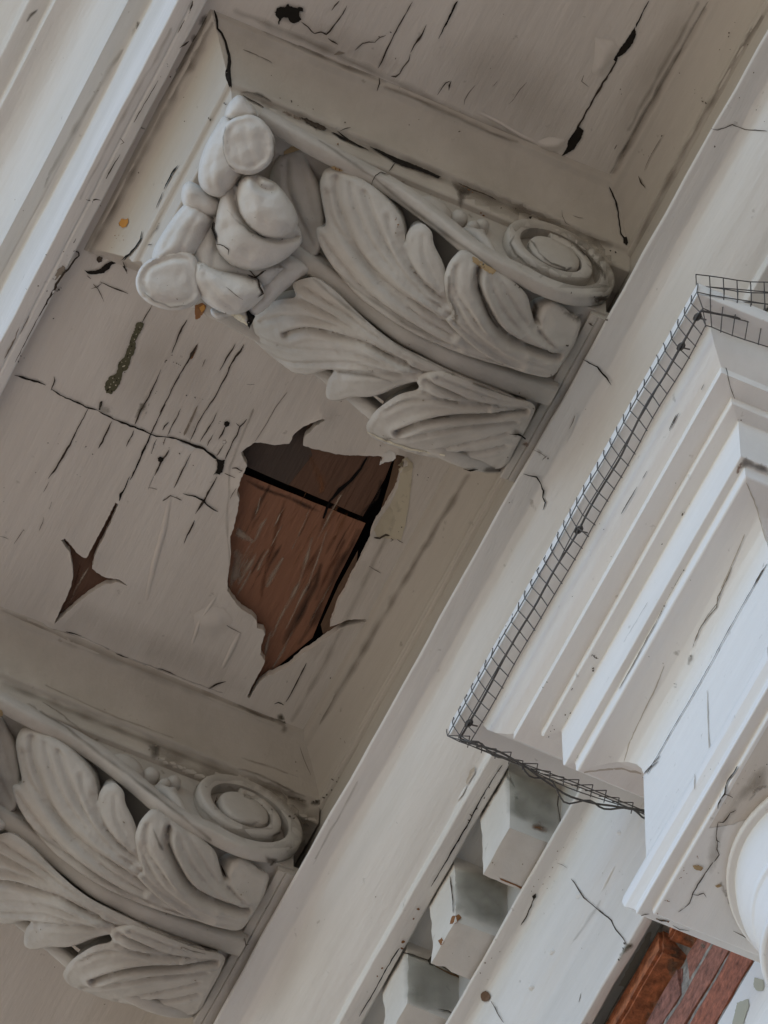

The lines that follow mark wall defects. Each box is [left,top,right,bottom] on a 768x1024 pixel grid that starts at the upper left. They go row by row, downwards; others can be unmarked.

crack [178,1,272,108]
crack [562,1,649,156]
crack [609,187,625,240]
crack [0,232,371,543]
crack [512,434,547,509]
crack [642,767,737,931]
crack [558,863,626,943]
peeling [732,977,764,1024]